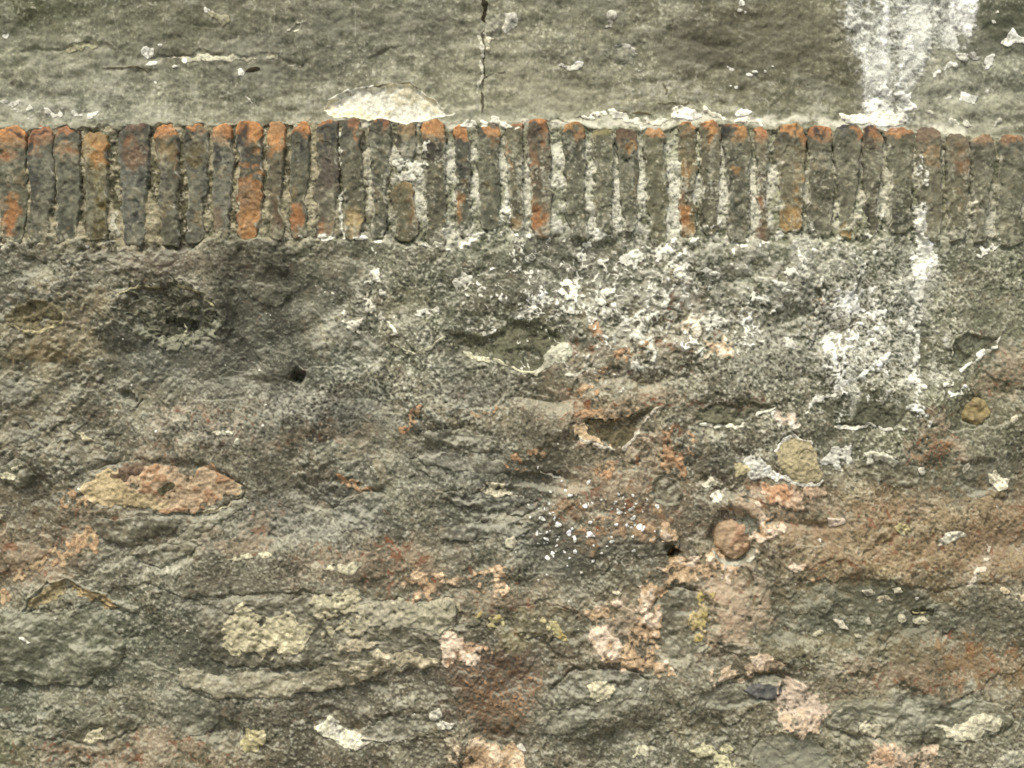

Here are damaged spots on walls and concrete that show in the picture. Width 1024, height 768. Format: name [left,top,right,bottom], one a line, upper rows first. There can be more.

spalling [324,82,520,130]
crack [476,31,505,112]
efflorescence [839,0,979,131]
efflorescence [945,89,989,104]